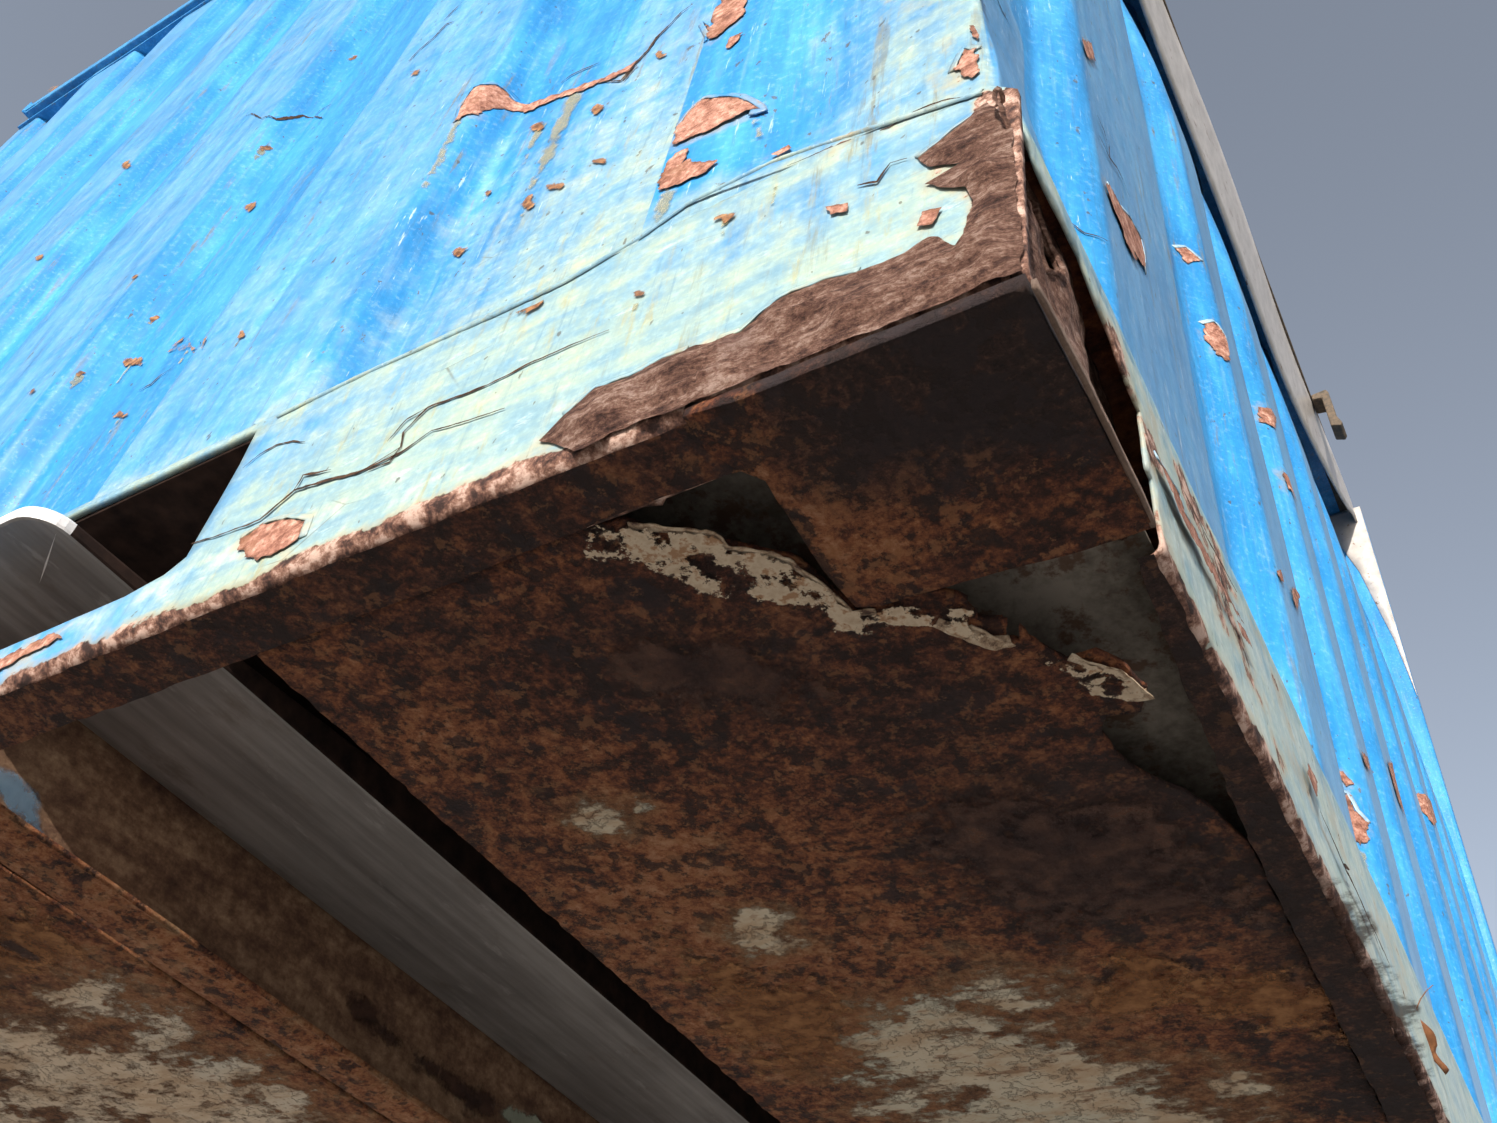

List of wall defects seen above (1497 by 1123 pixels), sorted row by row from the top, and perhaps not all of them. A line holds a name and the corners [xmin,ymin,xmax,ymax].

peeling [698,0,747,48]
peeling [423,60,637,186]
peeling [655,93,768,217]
rust [69,371,86,388]
rust [116,357,142,383]
crack [192,330,608,544]
peeling [1198,319,1231,361]
peeling [584,522,1016,651]
peeling [1045,653,1155,702]
rust [347,991,495,1117]
rust [1090,950,1348,1045]
rust [1317,875,1435,1112]